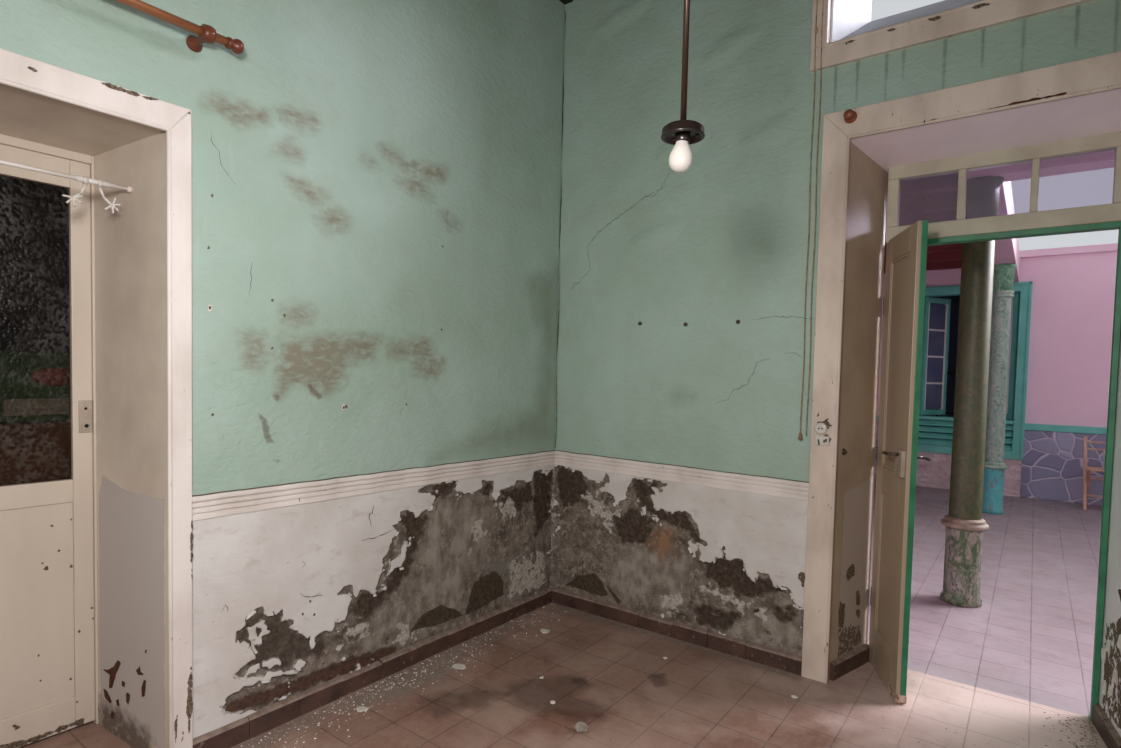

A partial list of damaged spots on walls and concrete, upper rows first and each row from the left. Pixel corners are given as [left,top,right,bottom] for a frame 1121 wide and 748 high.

crack [560,11,568,143]
crack [555,174,669,449]
spalling [219,465,805,715]
peeling [837,564,861,658]
peeling [0,718,84,748]
peeling [103,660,146,719]
peeling [1101,617,1121,729]